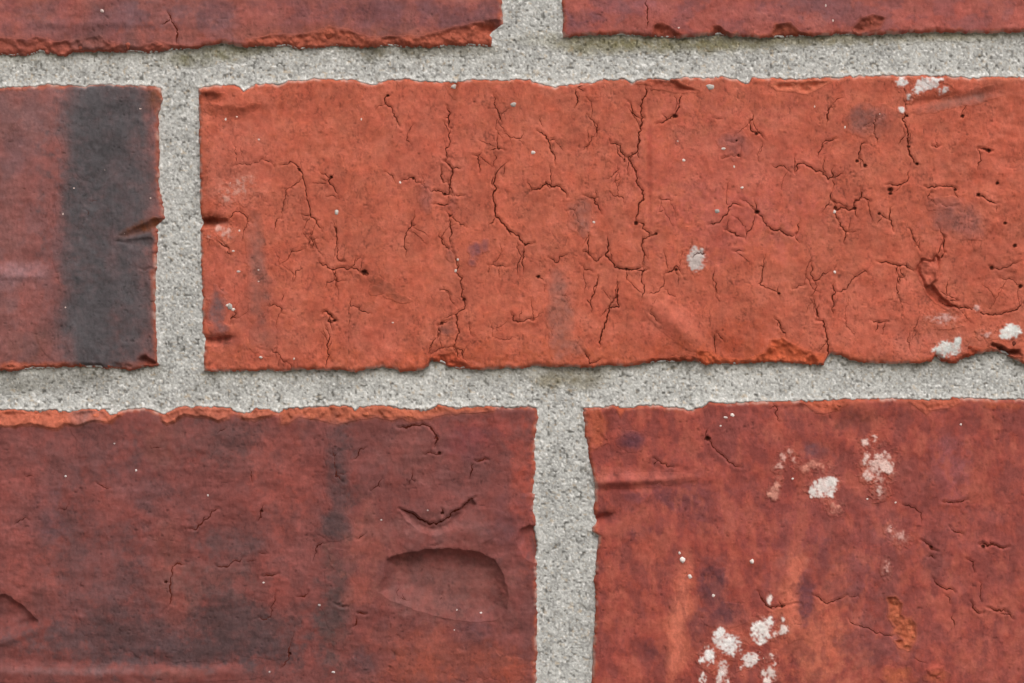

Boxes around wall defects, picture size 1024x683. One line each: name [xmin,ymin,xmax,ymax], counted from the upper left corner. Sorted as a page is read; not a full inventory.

crack [378,94,412,146]
crack [216,211,249,255]
crack [221,141,371,368]
crack [385,85,720,364]
crack [708,89,1024,357]
water stain [922,304,1024,361]
crack [399,458,488,525]
water stain [763,428,902,518]
water stain [695,564,788,683]